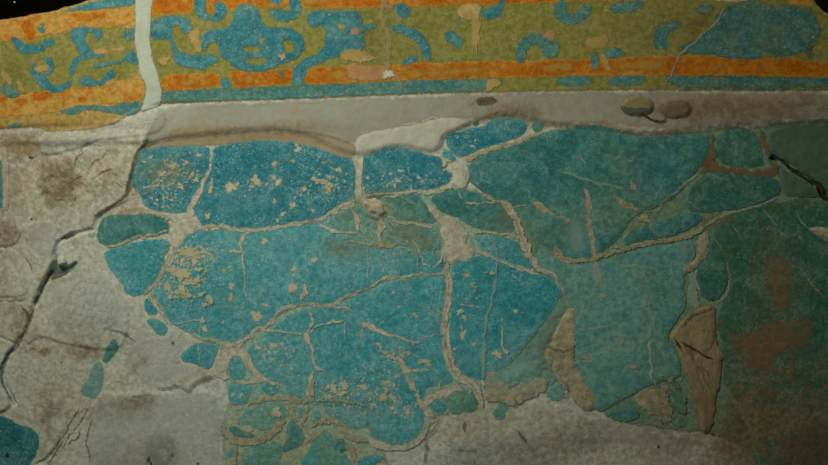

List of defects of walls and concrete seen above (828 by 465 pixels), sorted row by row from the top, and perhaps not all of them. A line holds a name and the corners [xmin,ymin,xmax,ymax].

crack [666,7,726,82]
spalling [116,128,356,245]
spalling [50,256,78,279]
peeling [151,247,215,322]
peeling [183,169,572,465]
crack [0,130,828,465]
peeling [570,118,828,465]